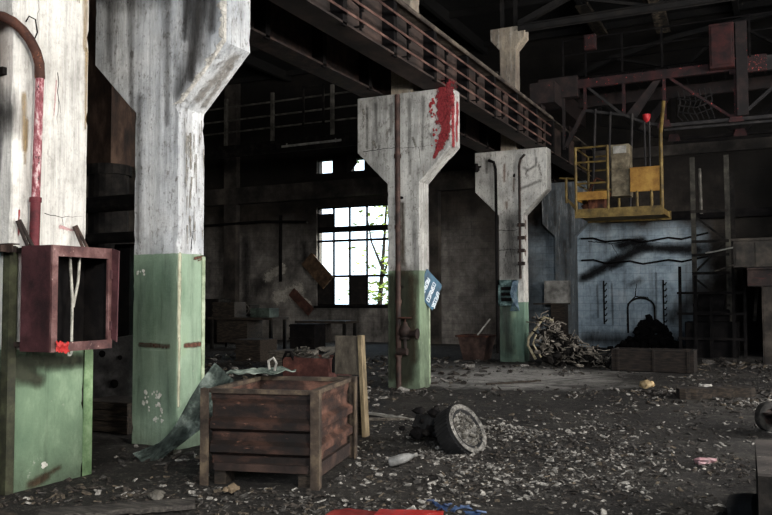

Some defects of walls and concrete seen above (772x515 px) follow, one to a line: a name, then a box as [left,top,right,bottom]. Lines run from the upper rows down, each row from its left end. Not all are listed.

water stain [0,94,28,163]
peeling [142,390,164,423]